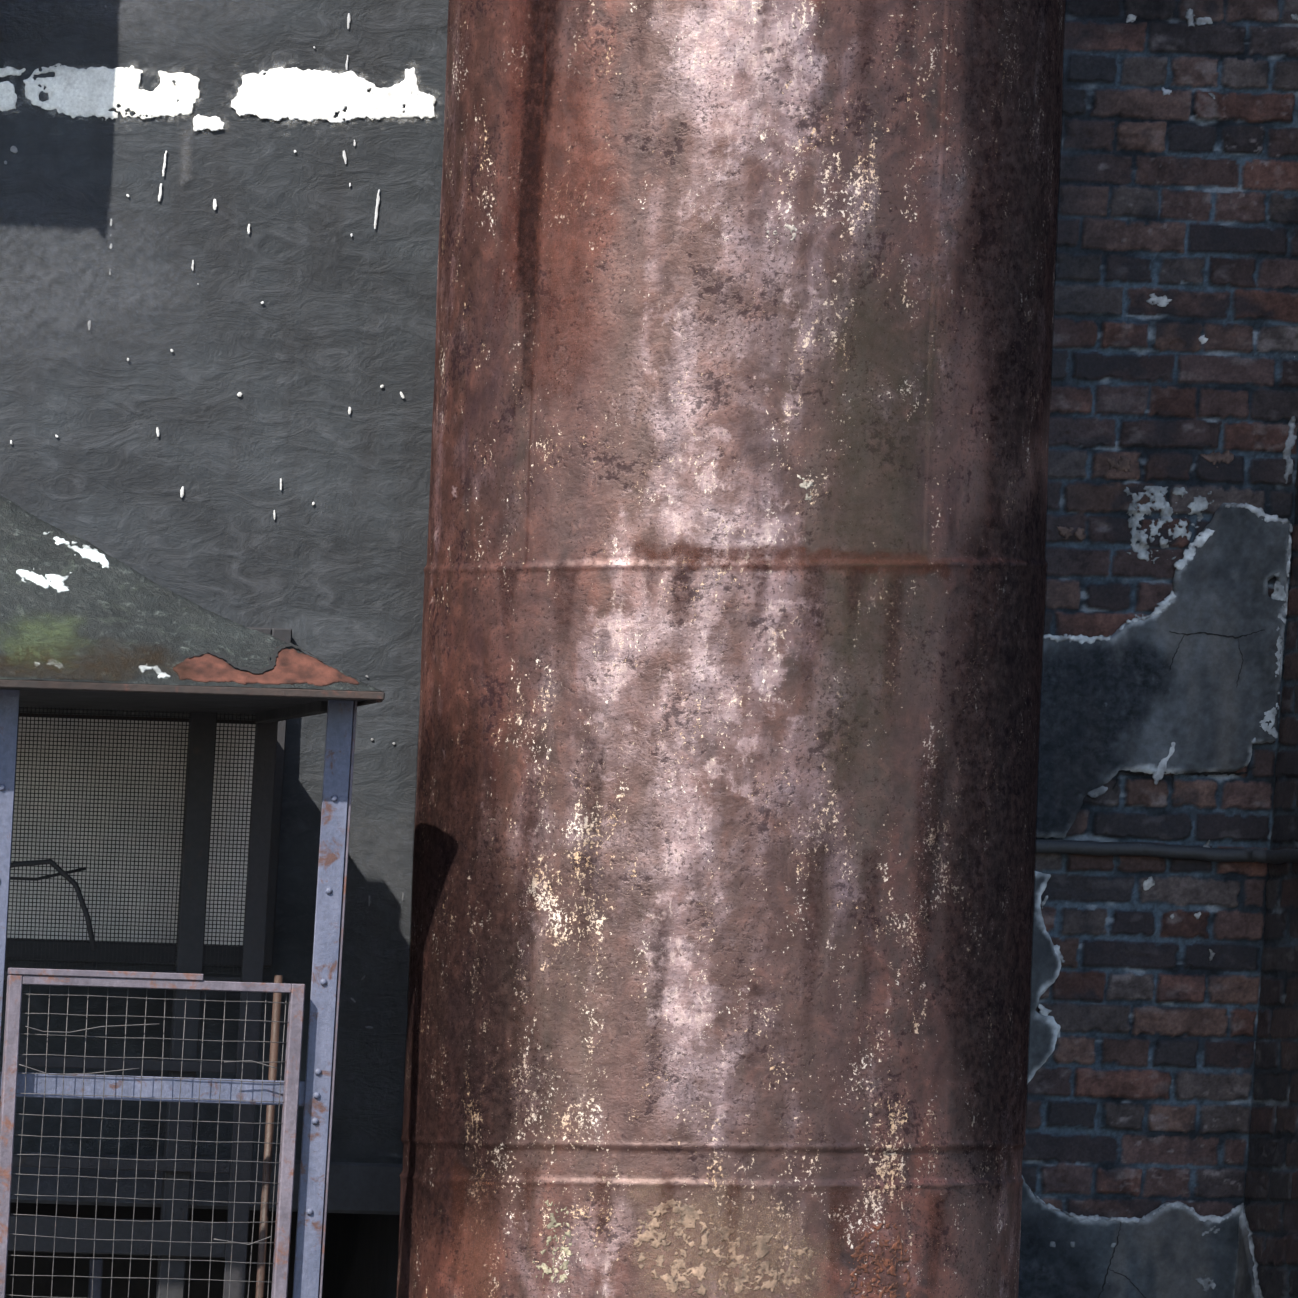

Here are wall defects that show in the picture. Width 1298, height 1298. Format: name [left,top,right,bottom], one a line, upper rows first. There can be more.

peeling [0,63,436,131]
rust [634,543,949,592]
flaking render [1174,528,1214,570]
flaking render [1225,503,1293,626]
flaking render [1044,590,1177,644]
rust [173,647,359,686]
crack [1169,630,1263,685]
flaking render [1026,1185,1244,1223]